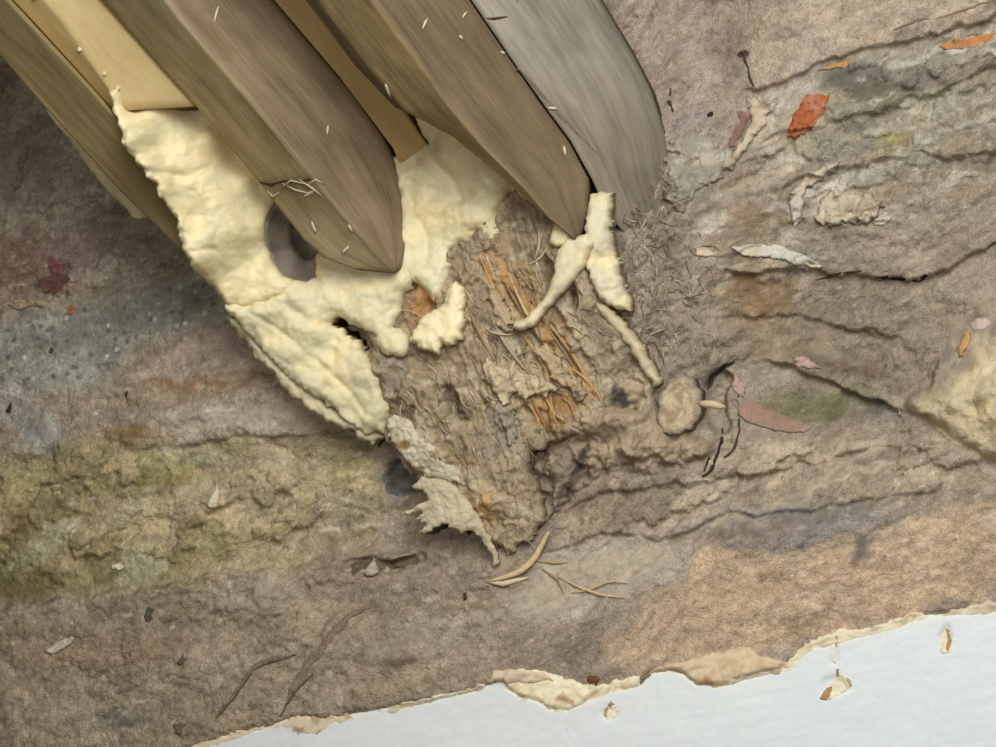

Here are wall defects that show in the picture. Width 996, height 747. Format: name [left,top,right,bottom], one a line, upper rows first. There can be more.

crack [893,0,994,31]
crack [816,270,930,283]
peeling [940,600,996,654]
peeling [377,612,927,720]
peeling [192,713,354,747]